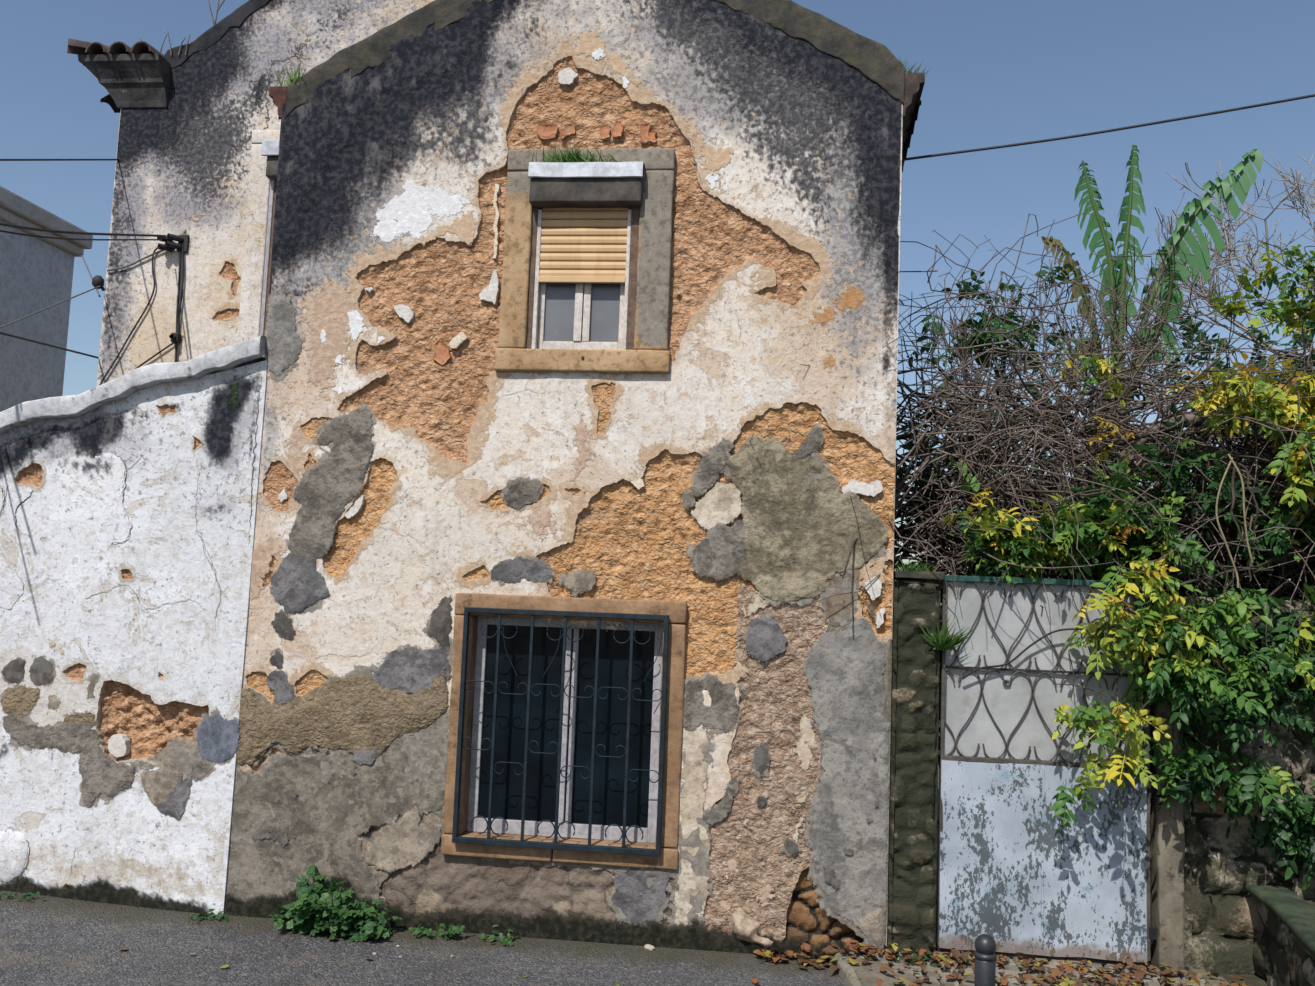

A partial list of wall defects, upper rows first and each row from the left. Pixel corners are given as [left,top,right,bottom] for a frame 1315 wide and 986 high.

leakage [98,0,353,378]
leakage [269,0,539,304]
leakage [620,0,901,329]
flaking render [211,258,241,324]
leakage [0,408,148,477]
leakage [204,375,261,463]
crack [0,486,33,536]
crack [111,449,144,544]
crack [85,467,227,620]
flaking render [261,31,896,959]
flaking render [49,640,87,684]
flaking render [93,678,209,768]